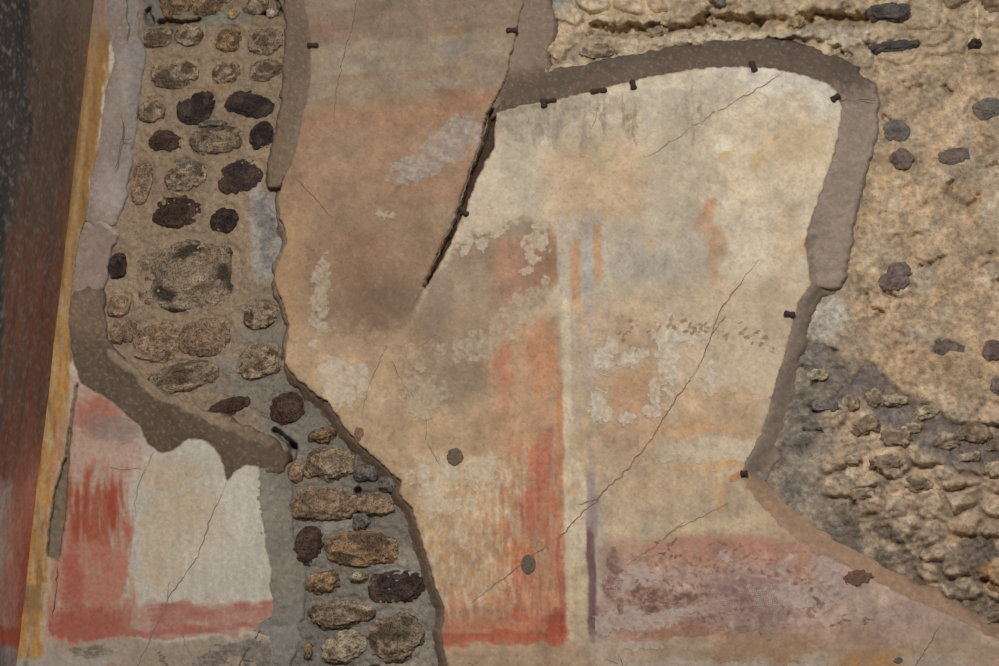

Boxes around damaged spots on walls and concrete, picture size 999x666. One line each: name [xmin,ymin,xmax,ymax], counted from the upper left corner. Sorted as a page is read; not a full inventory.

spalling [104,0,513,666]
crack [416,110,496,299]
peeling [436,221,554,364]
crack [647,75,779,157]
spalling [545,0,999,652]
crack [473,263,756,602]
crack [137,483,226,666]